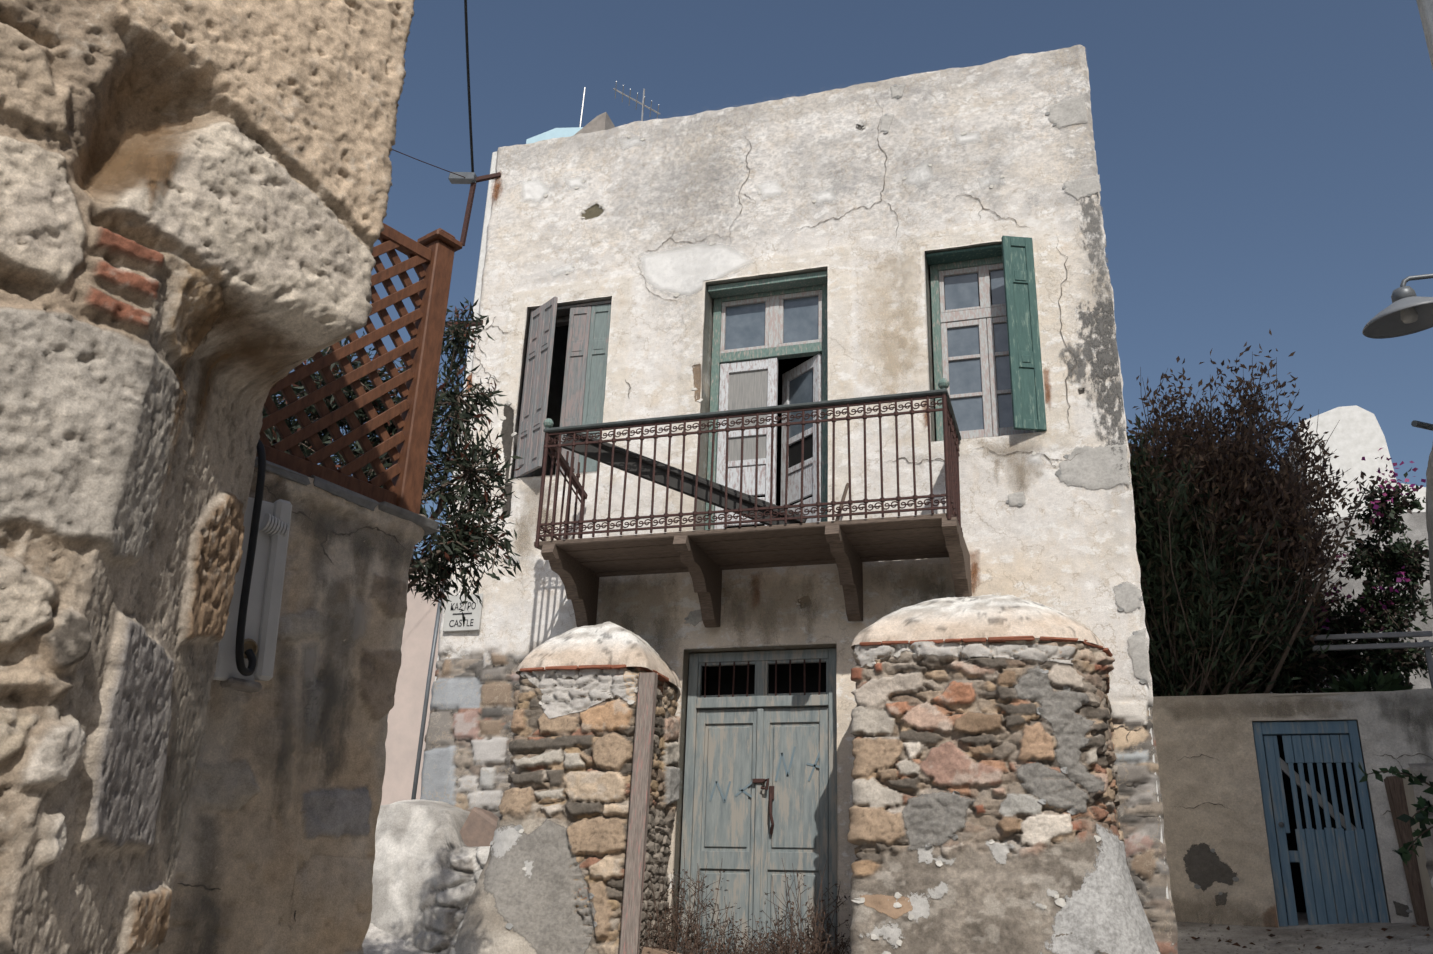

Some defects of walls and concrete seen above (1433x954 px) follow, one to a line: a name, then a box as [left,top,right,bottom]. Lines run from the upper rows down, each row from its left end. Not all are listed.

spalling [1045,95,1088,129]
crack [790,98,899,236]
crack [638,135,756,301]
spalling [1055,443,1131,490]
peeling [854,641,1075,674]
peeling [520,668,638,719]
spalling [851,834,958,954]
peeling [985,839,1016,864]
peeling [1183,842,1239,906]